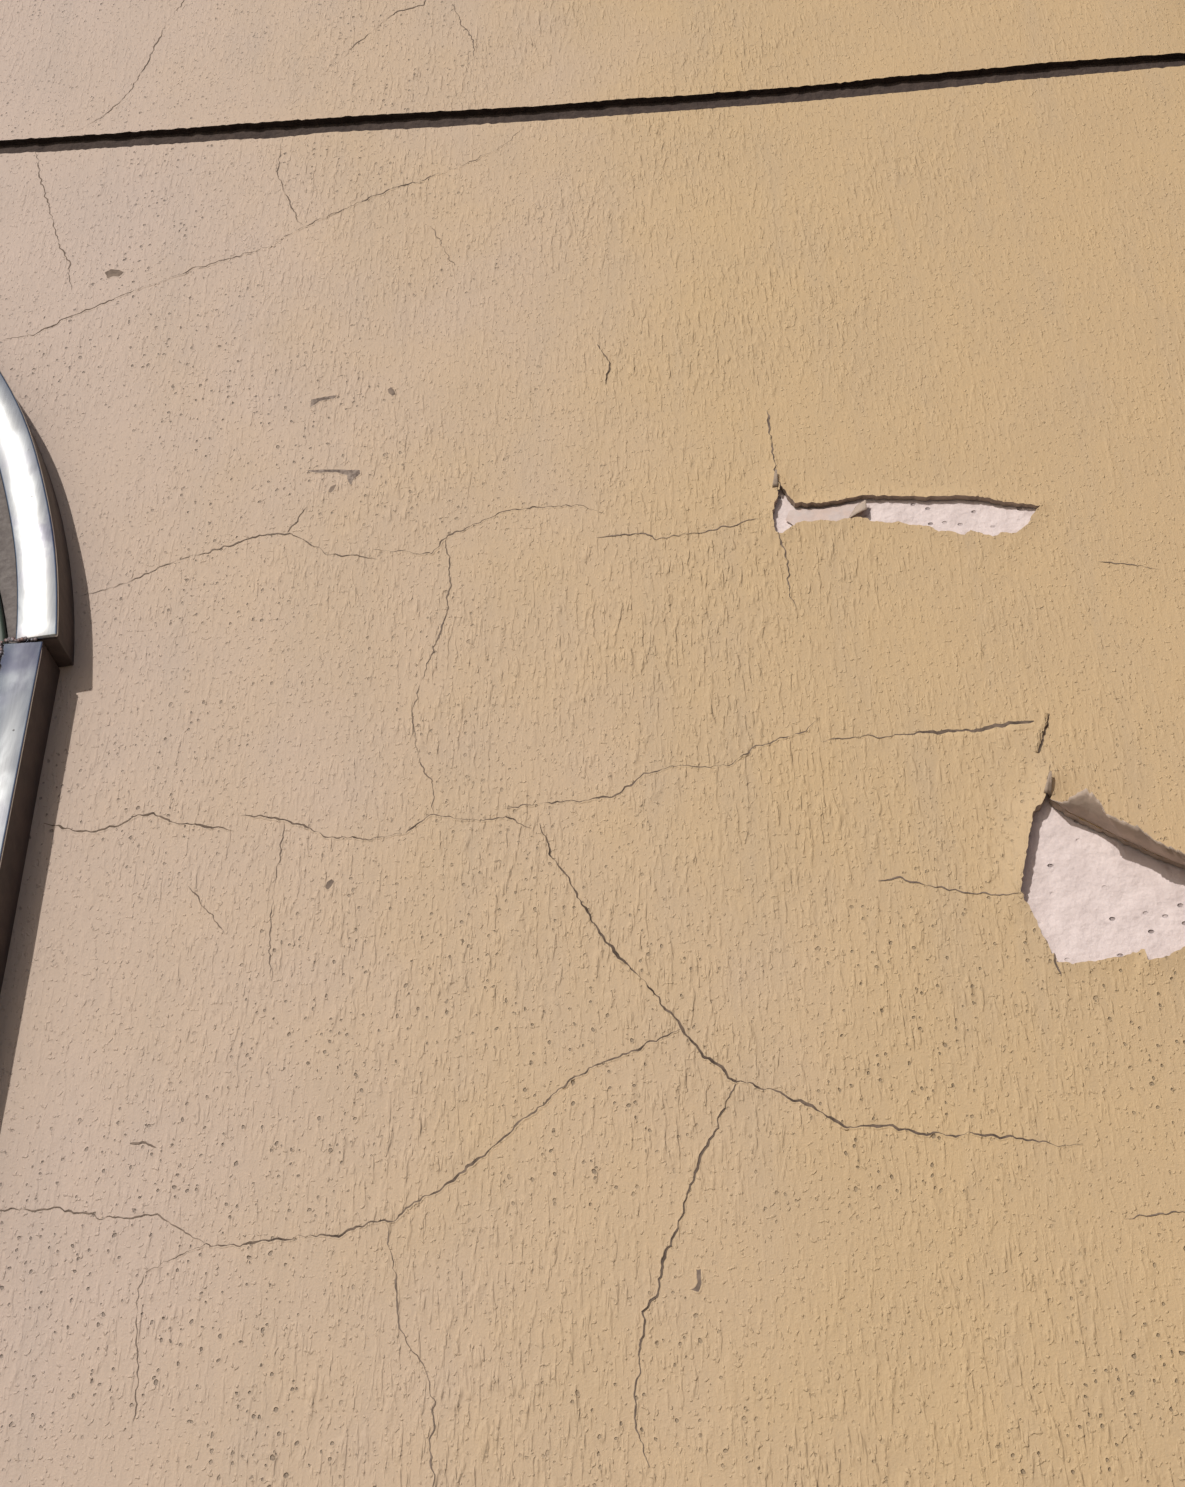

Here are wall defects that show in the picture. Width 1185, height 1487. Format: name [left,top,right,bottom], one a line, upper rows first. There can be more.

crack [3,128,524,341]
peeling [772,469,1036,536]
crack [0,411,1083,1484]
peeling [1021,764,1185,976]
crack [1126,1211,1184,1219]